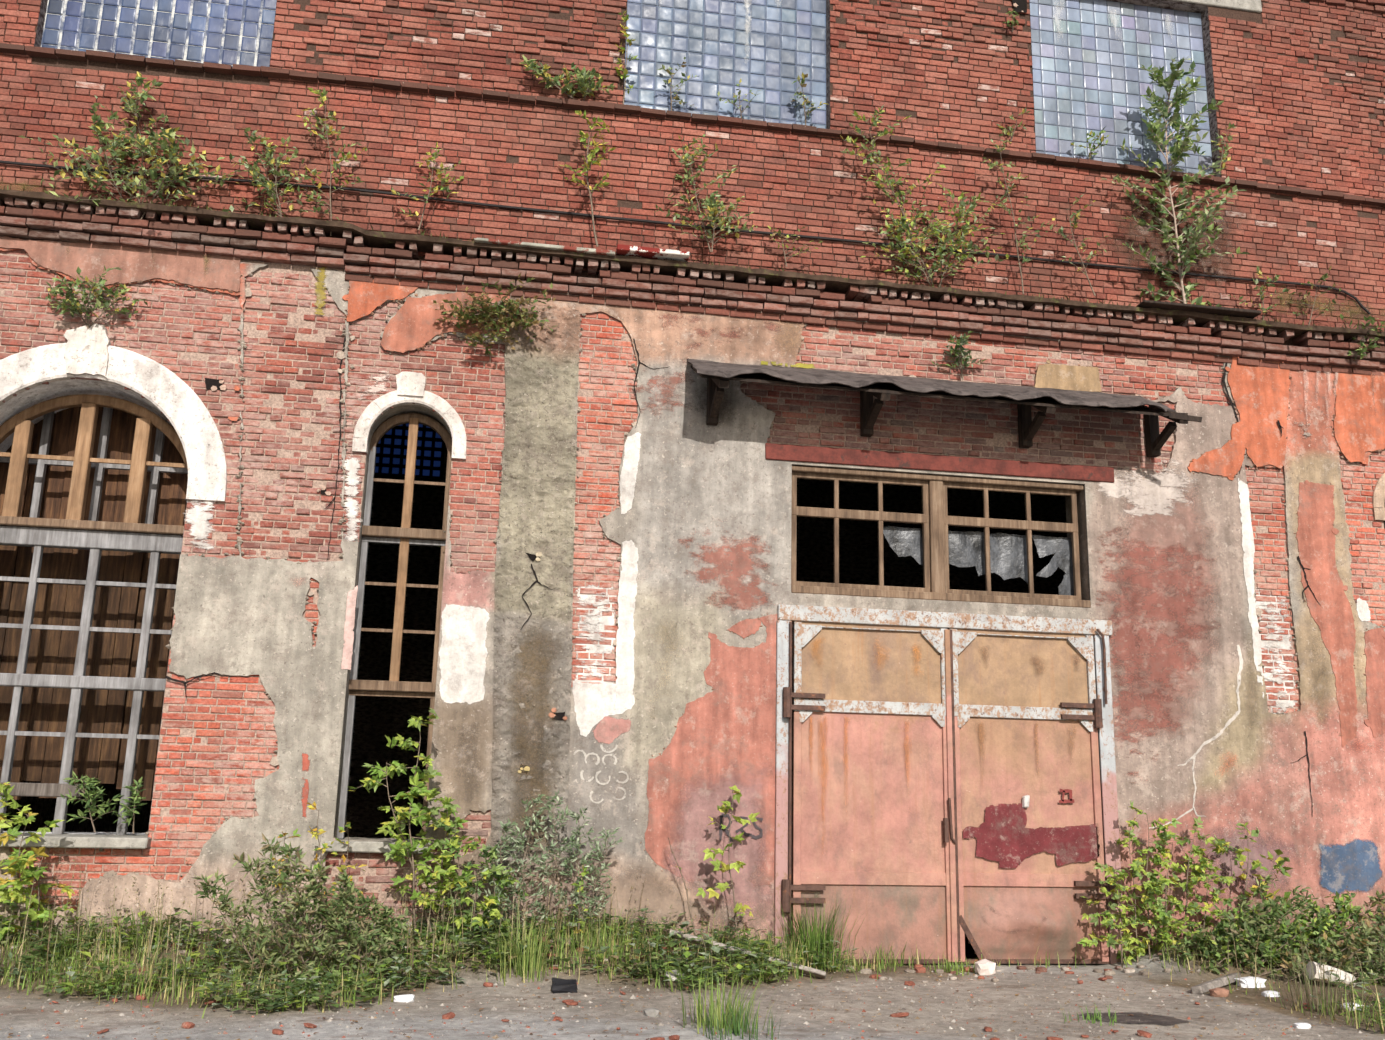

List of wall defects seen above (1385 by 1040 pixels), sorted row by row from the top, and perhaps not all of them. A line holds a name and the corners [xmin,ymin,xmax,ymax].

spalling [10,607,282,912]
peeling [0,236,513,647]
peeling [301,753,310,817]
crack [521,564,555,629]
peeling [594,716,631,744]
spalling [571,313,691,687]
peeling [640,537,777,887]
spalling [740,324,1385,759]
crack [1149,645,1243,829]
crack [1297,556,1319,603]